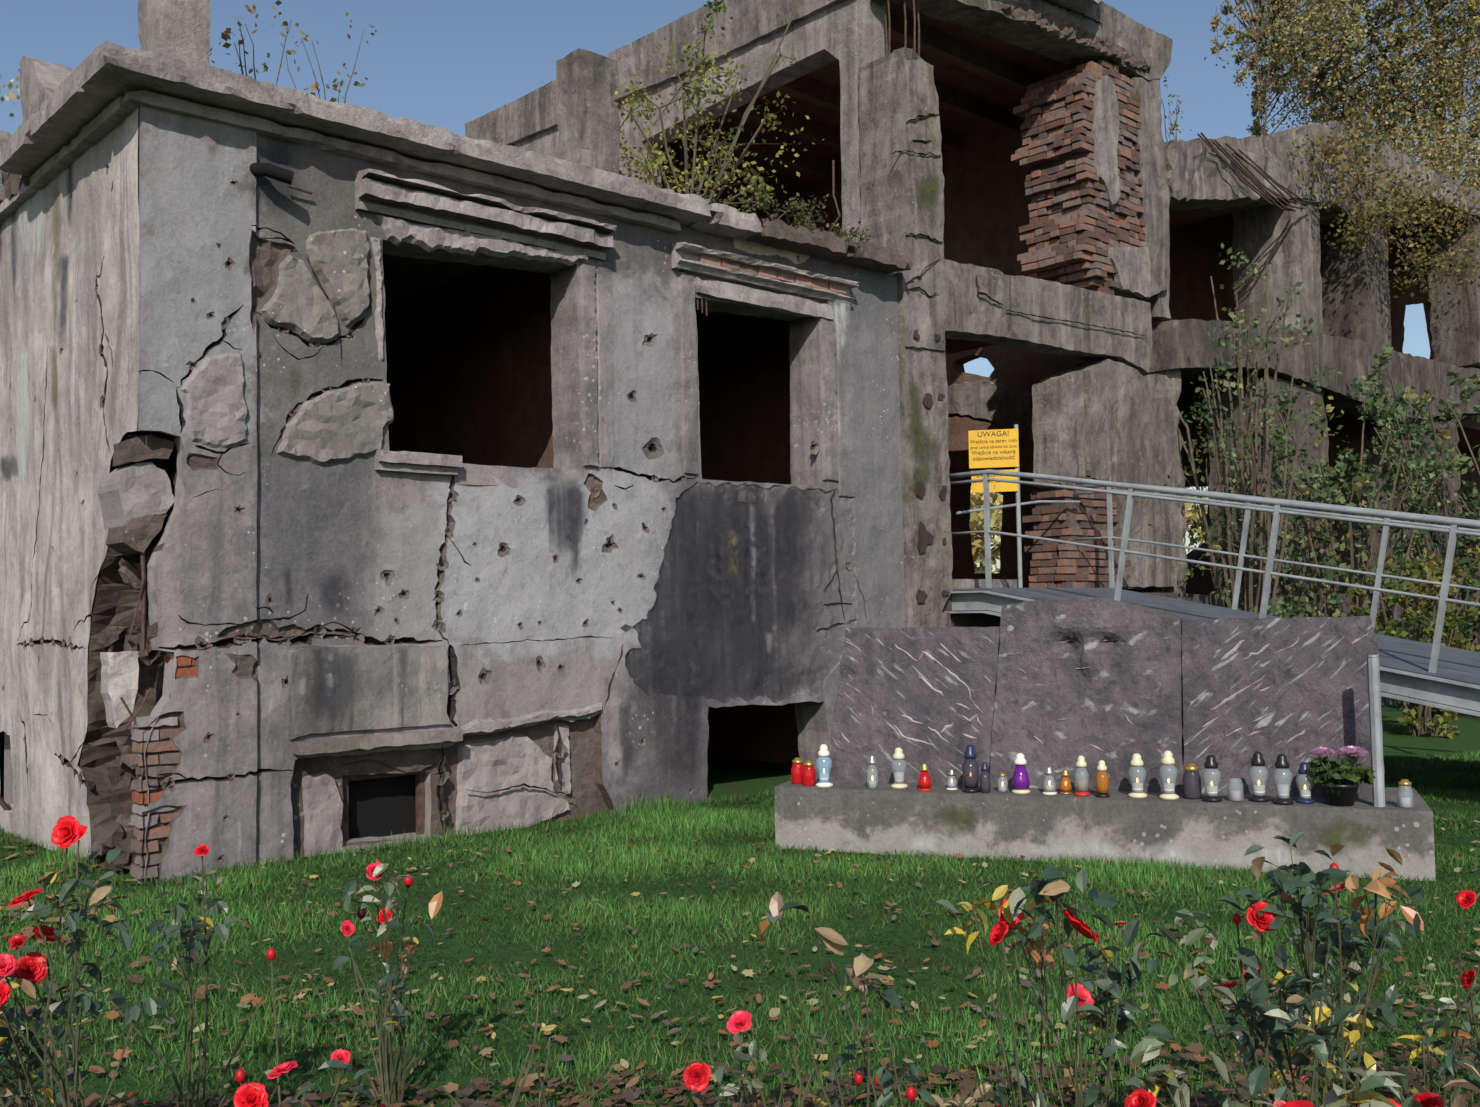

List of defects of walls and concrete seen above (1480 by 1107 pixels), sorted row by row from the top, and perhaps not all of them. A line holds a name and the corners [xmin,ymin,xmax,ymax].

crack [891,113,940,157]
spalling [249,229,298,335]
crack [17,225,623,884]
leakage [548,485,581,565]
spalling [584,473,607,511]
spalling [130,711,188,884]